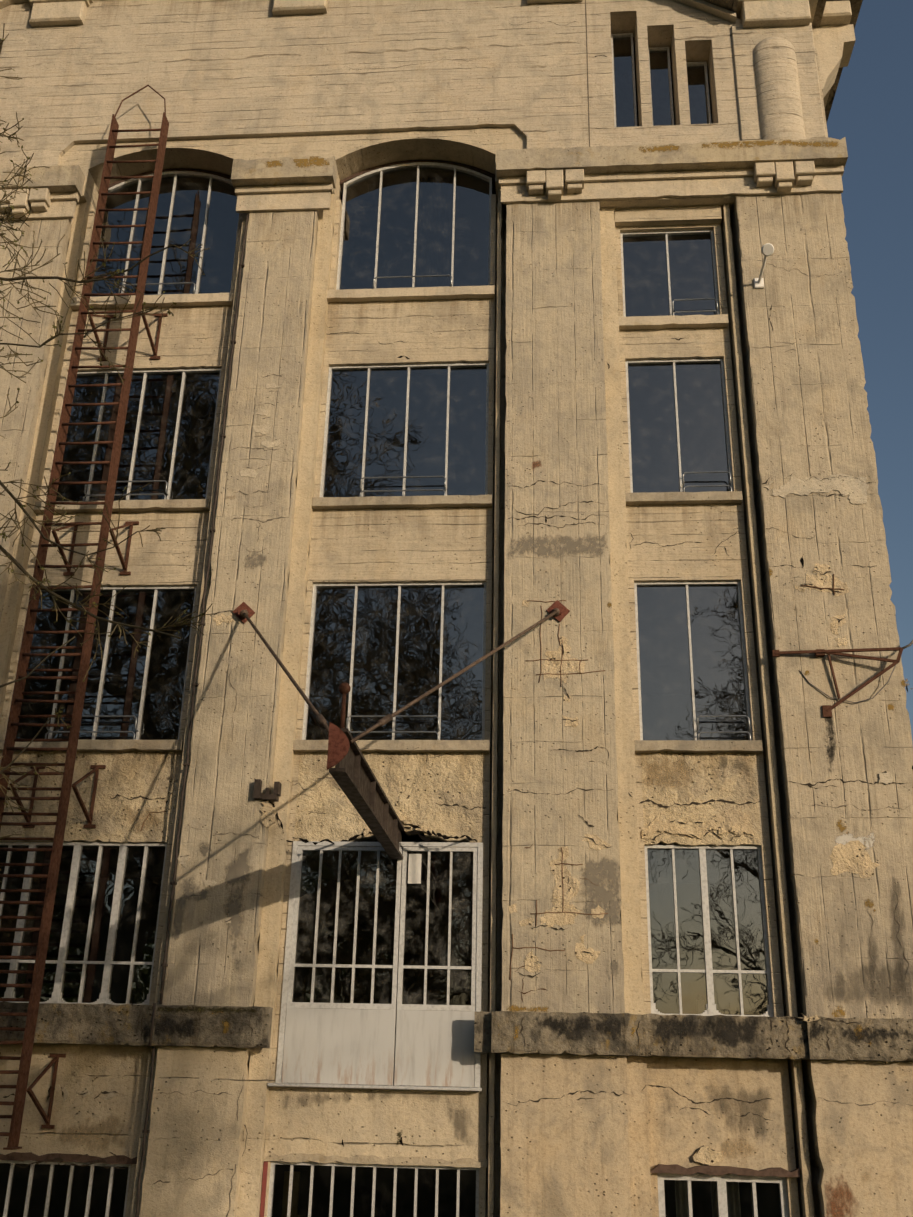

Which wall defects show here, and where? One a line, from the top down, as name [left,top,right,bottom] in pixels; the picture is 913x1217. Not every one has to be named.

crack [508,480,608,528]
peeling [762,474,872,505]
water stain [509,536,606,557]
crack [630,527,814,580]
spalling [794,563,850,597]
crack [784,778,910,811]
spalling [830,840,879,879]
spalling [508,815,620,980]
crack [505,1085,773,1121]
crack [806,1096,913,1106]
corrosion [826,1183,852,1217]